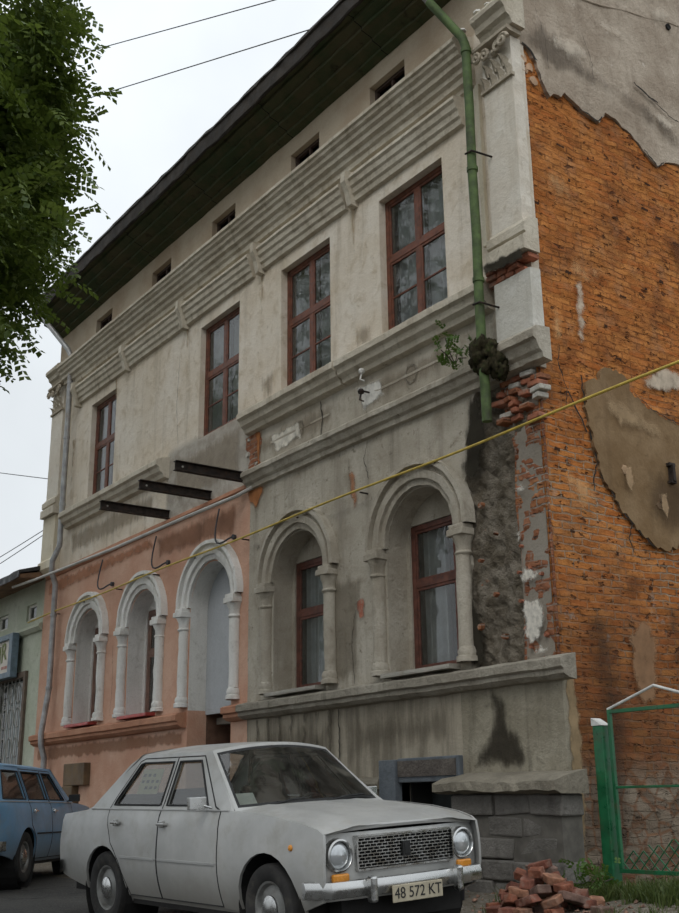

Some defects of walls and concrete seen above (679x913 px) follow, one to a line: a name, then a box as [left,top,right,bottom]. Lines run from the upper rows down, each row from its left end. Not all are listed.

crack [634,82,678,122]
flaking render [245,423,300,469]
flaking render [467,48,679,886]
water stain [479,698,523,766]